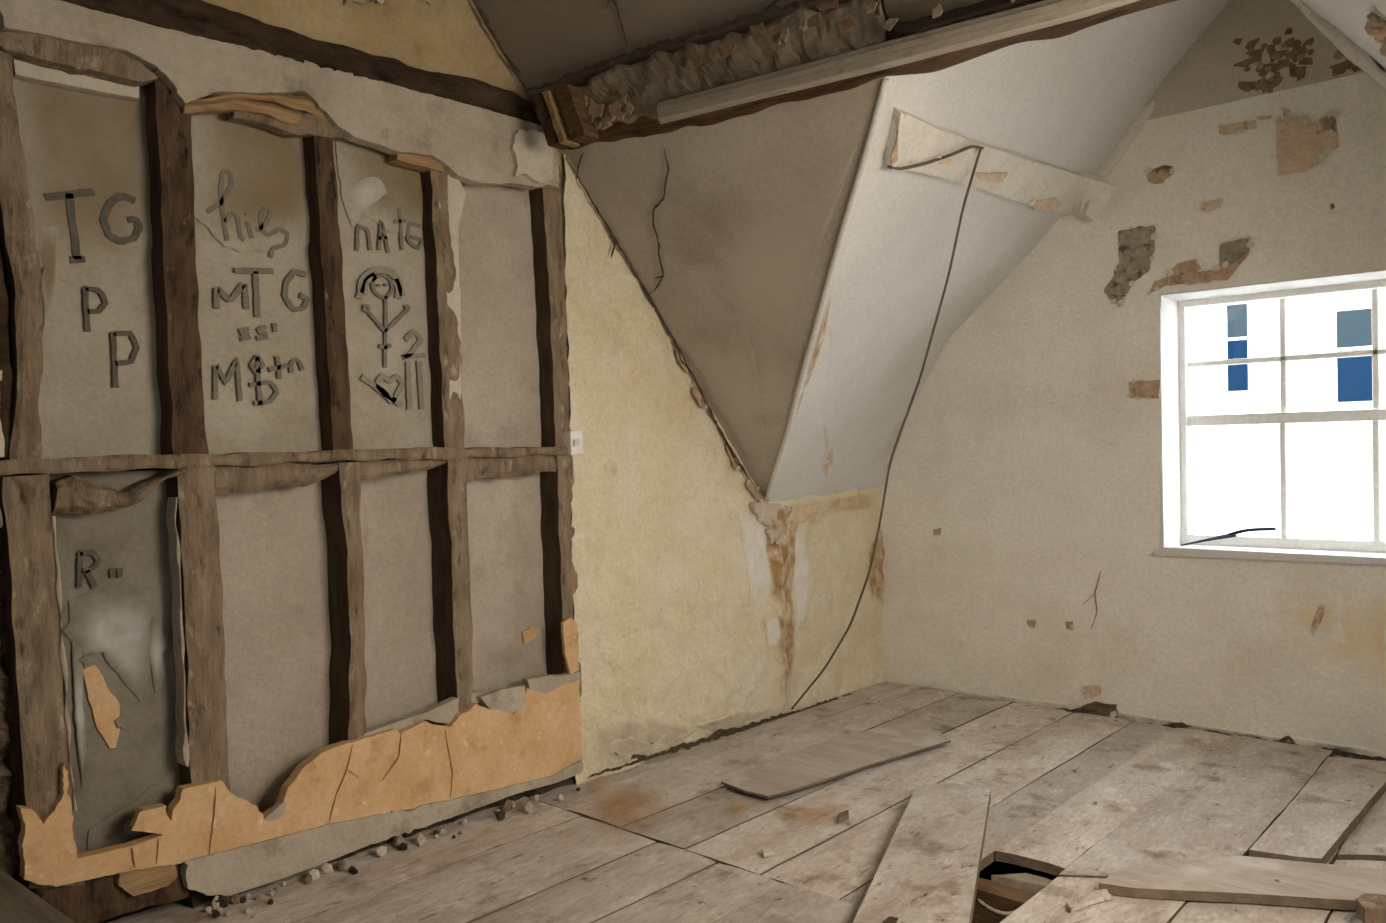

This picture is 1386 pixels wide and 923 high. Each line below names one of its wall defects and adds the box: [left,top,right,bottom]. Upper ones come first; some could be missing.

crack [473,0,817,92]
peeling [1233,27,1361,93]
flaking render [1364,5,1386,57]
peeling [1219,107,1341,176]
flaking render [0,0,560,399]
peeling [1104,226,1255,307]
crack [565,149,764,498]
peeling [1127,379,1160,401]
flaking render [16,617,583,896]